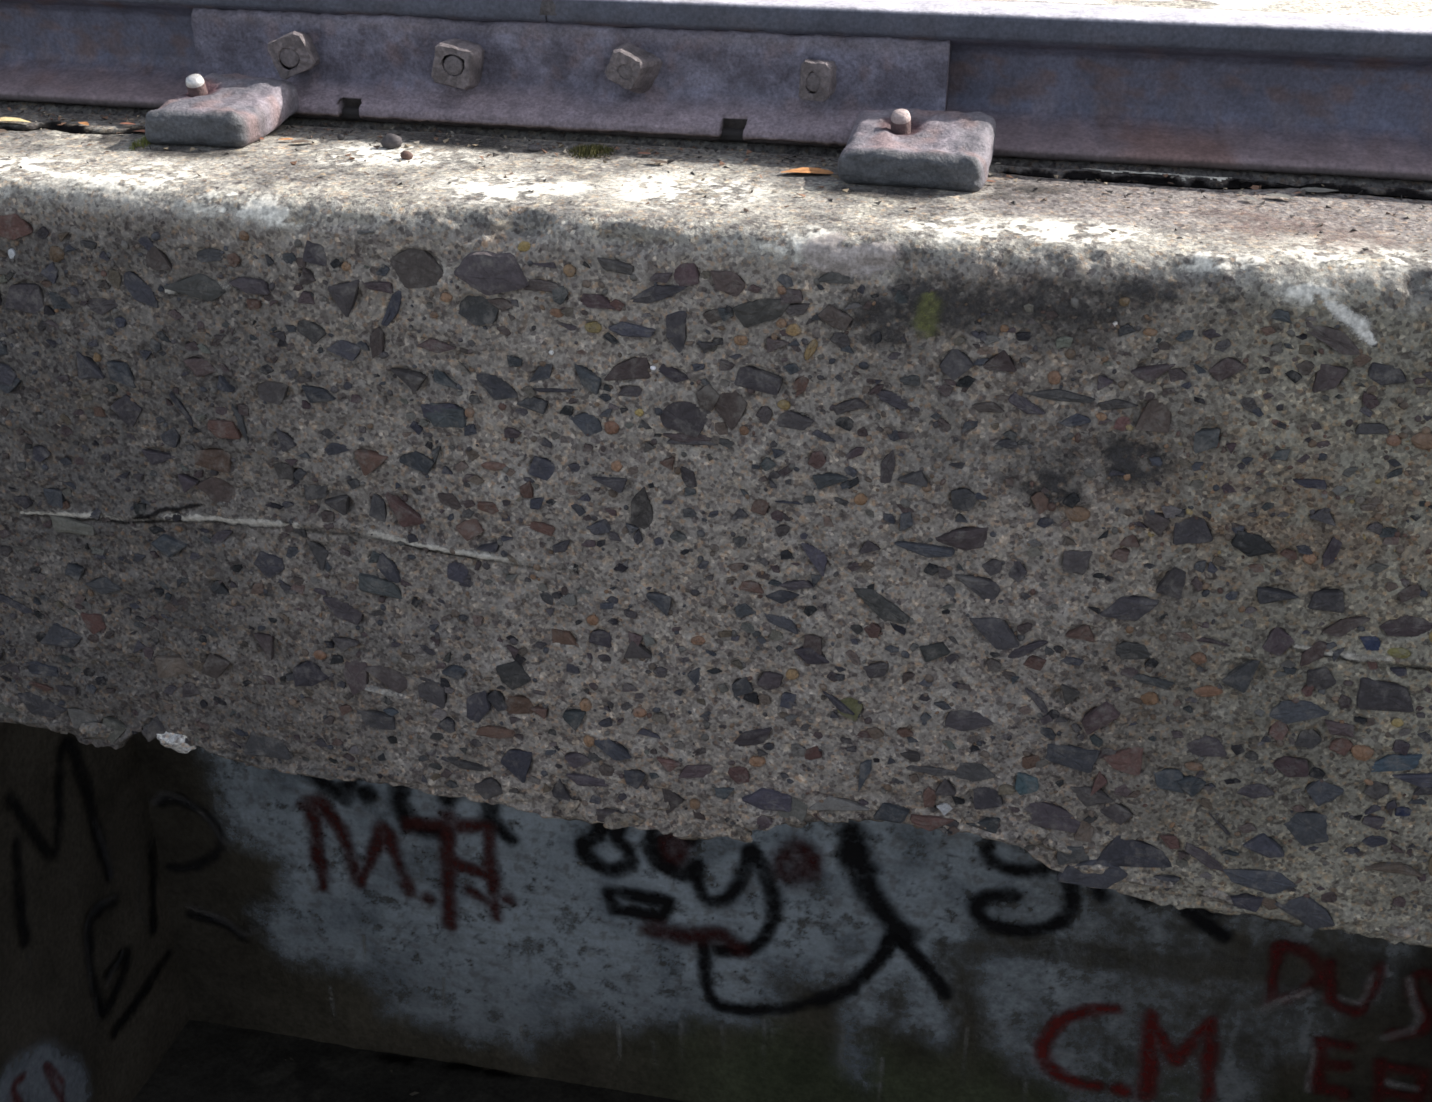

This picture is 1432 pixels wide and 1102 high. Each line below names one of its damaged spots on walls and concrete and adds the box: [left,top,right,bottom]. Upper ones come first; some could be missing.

crack [20,504,517,565]
crack [1294,644,1431,671]